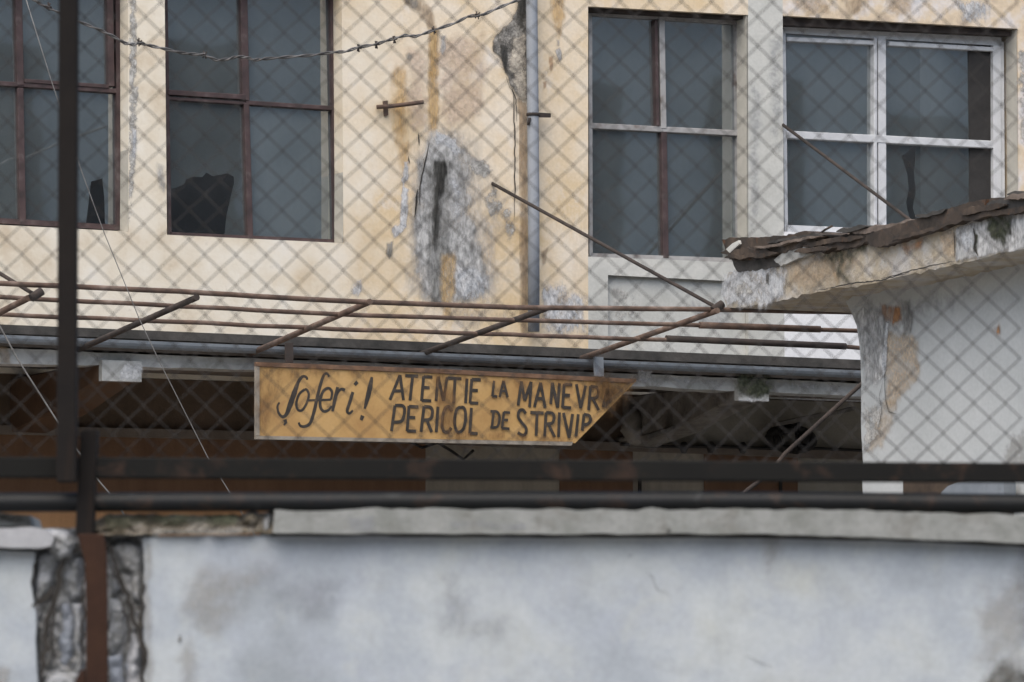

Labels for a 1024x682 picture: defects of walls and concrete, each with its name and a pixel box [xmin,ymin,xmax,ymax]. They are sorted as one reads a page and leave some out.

flaking render [493,0,527,99]
crack [408,134,429,217]
leakage [406,0,491,313]
peeling [453,264,487,298]
peeling [722,256,844,307]
peeling [940,214,1024,261]
peeling [856,306,919,444]
spalling [34,528,86,682]
spalling [108,539,145,682]